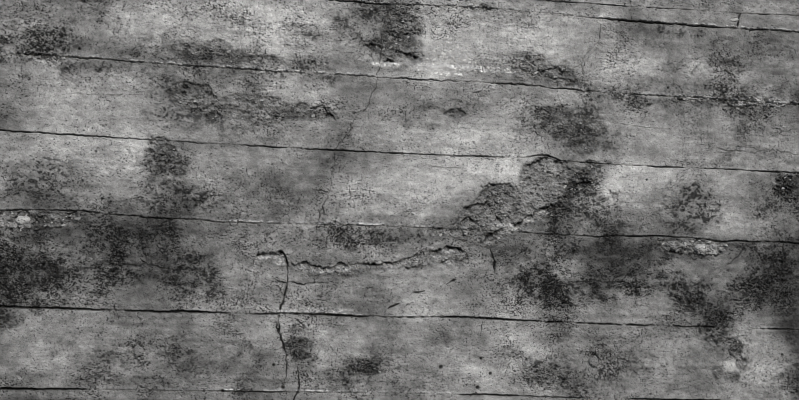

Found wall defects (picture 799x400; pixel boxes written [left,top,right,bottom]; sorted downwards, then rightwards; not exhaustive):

spalling [365,6,423,63]
crack [312,107,367,218]
spalling [443,108,465,119]
spalling [430,155,593,248]
peeling [538,106,605,155]
crack [275,246,465,400]